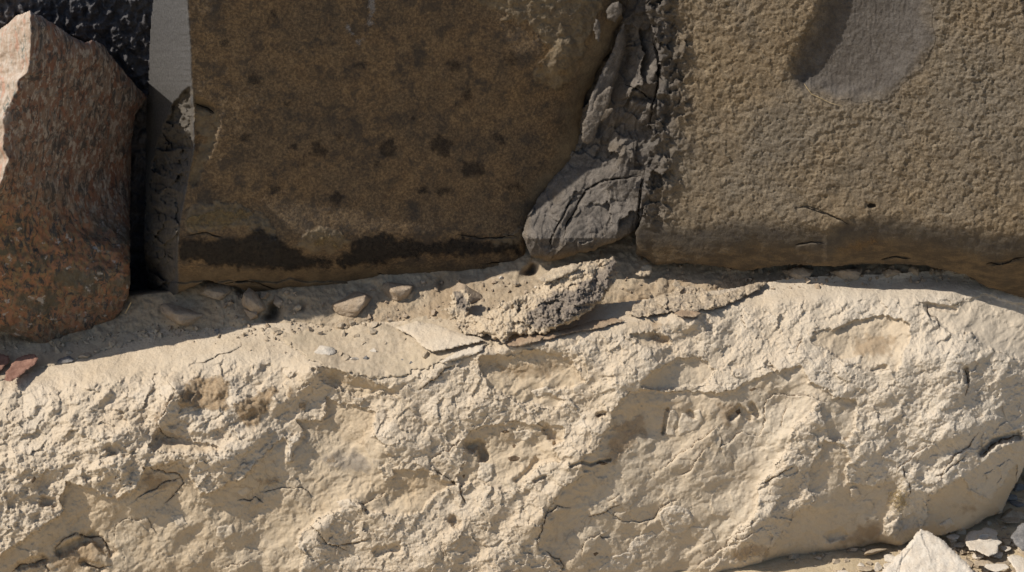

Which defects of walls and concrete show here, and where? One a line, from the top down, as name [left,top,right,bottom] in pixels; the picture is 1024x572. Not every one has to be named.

crack [458,0,661,264]
damp [179,229,521,271]
crack [937,435,1018,477]
crack [12,466,184,572]